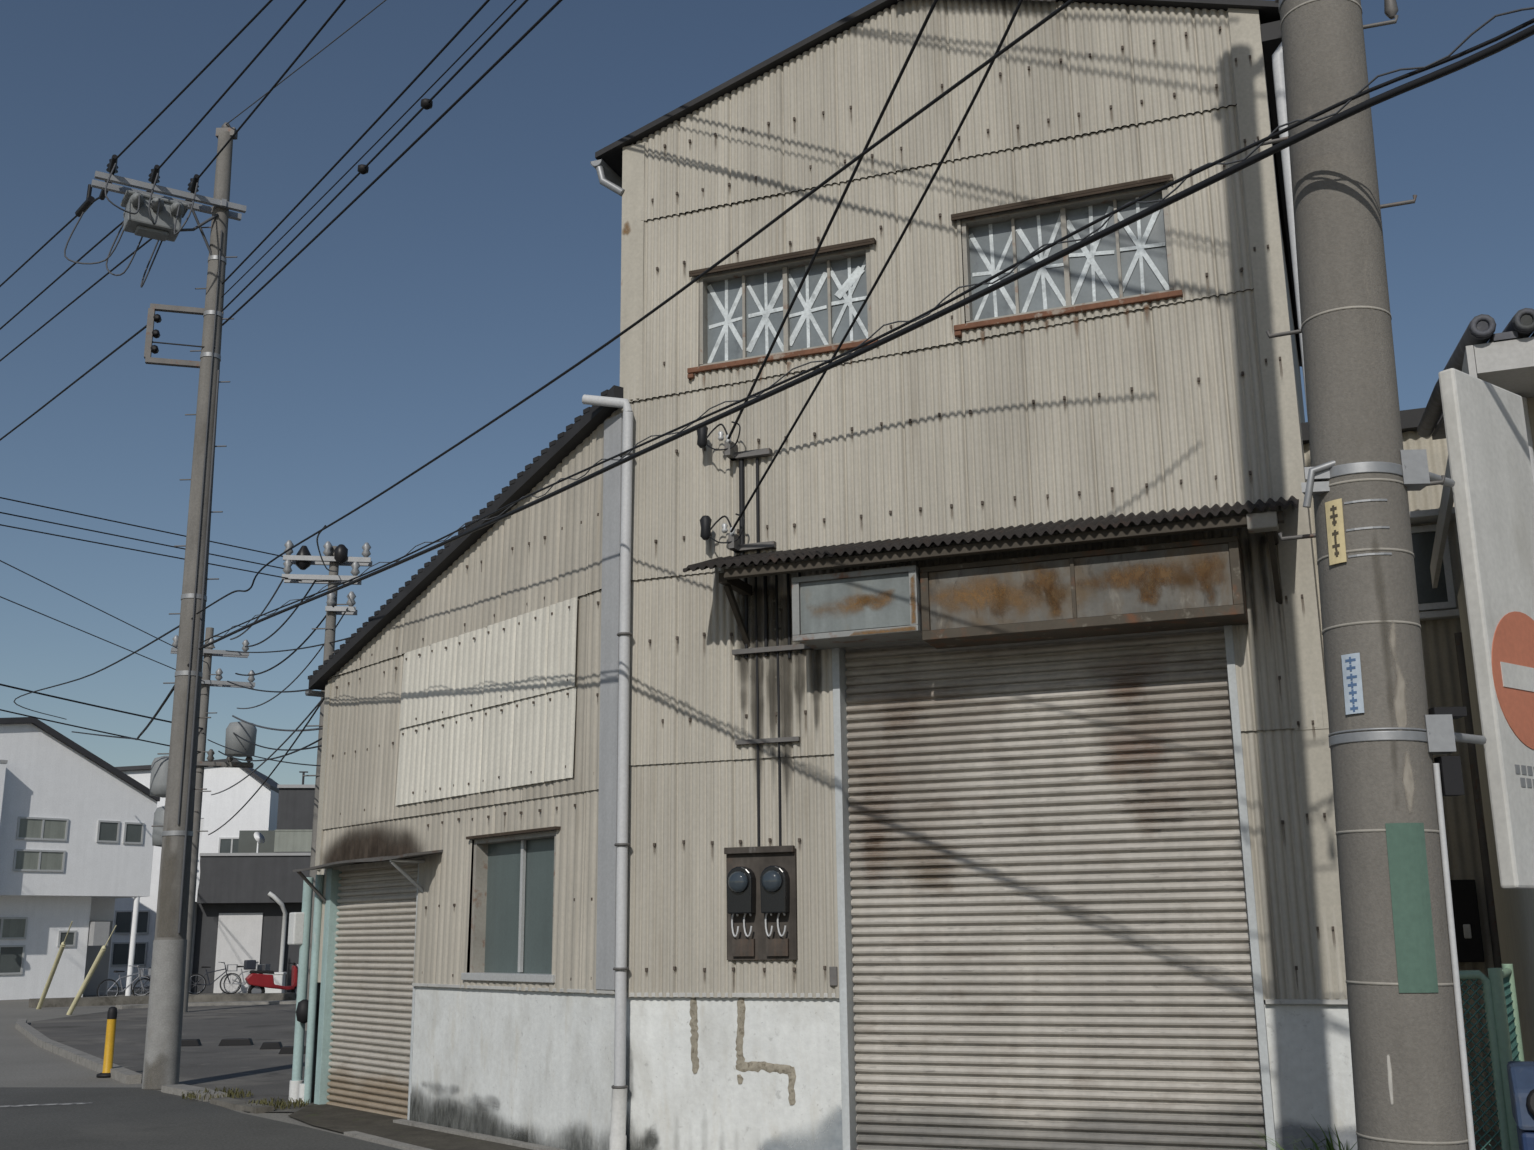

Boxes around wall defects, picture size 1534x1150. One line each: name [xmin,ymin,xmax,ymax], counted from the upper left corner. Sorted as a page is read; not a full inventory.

corrosion [843,592,891,611]
corrosion [1027,565,1186,615]
crack [689,997,699,1074]
crack [735,998,796,1105]
leakage [409,1087,536,1144]
leakage [560,1130,592,1150]